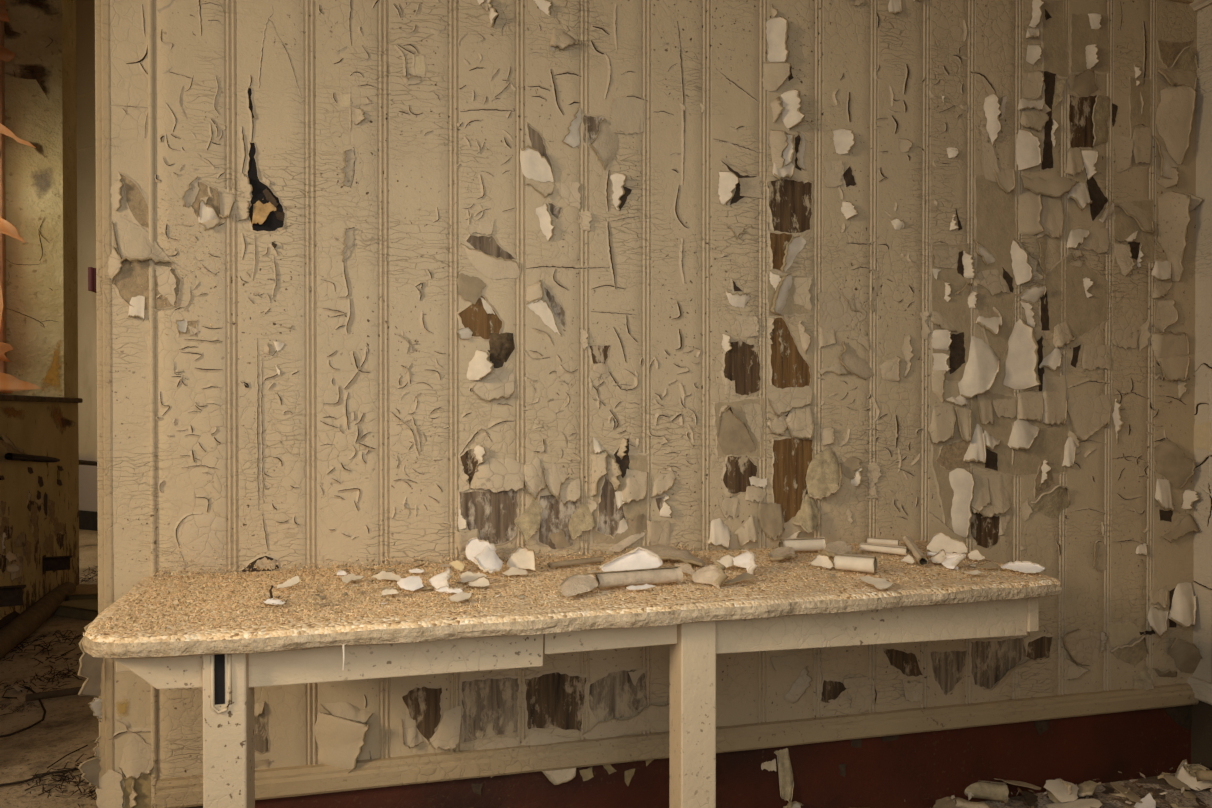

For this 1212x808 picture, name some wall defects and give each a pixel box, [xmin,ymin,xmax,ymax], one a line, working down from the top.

peeling [342,148,355,188]
peeling [108,171,200,338]
peeling [320,227,355,334]
crack [110,0,761,540]
peeling [877,0,1212,575]
peeling [314,563,434,607]
peeling [859,576,893,589]
peeling [400,667,670,752]
peeling [541,760,653,786]
peeling [761,748,794,802]